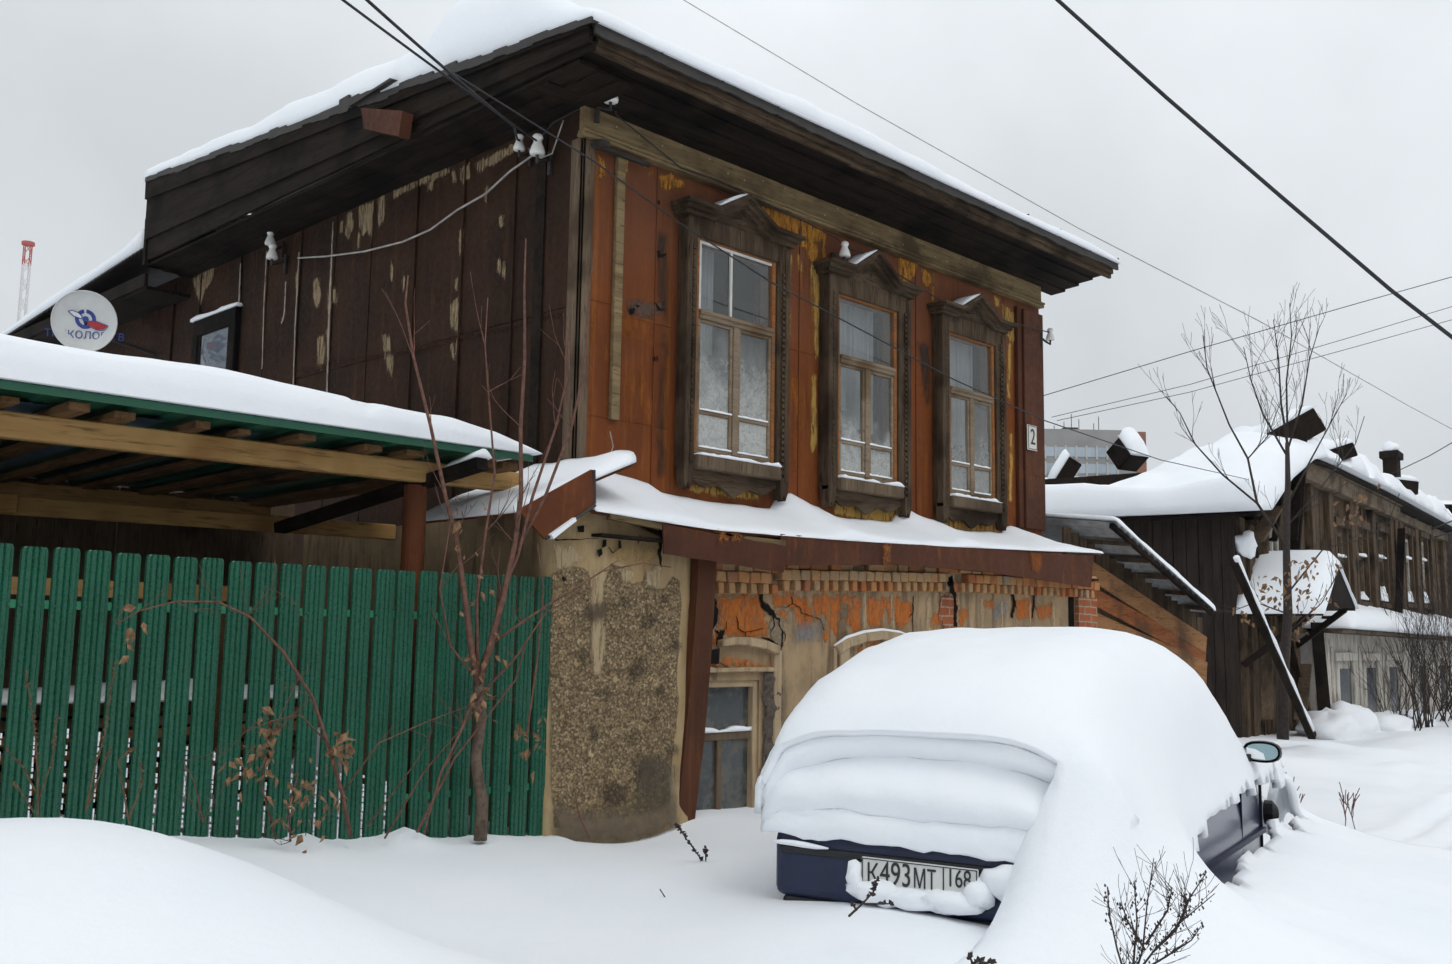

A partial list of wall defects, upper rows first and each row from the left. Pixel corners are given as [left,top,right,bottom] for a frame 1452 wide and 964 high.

peeling [340,143,514,248]
peeling [193,268,214,307]
peeling [295,271,337,310]
peeling [450,277,459,359]
peeling [317,329,329,369]
peeling [382,334,394,378]
spalling [931,595,1053,629]
peeling [711,593,913,773]